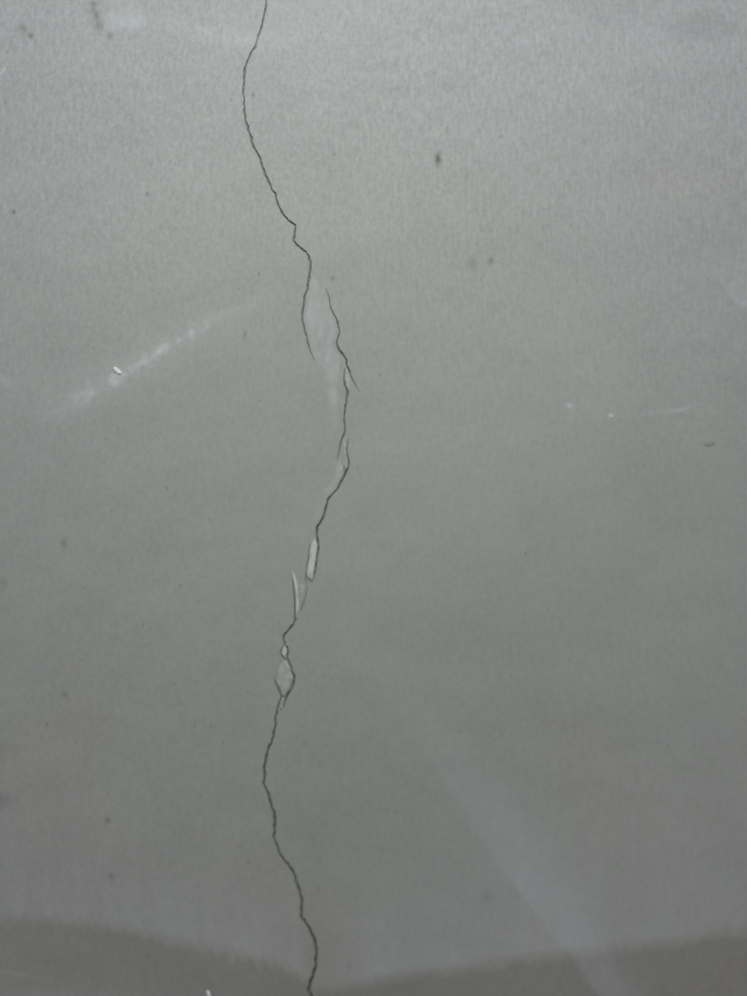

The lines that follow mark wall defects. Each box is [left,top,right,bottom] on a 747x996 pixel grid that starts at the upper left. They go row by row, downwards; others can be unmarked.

crack [242,0,361,996]